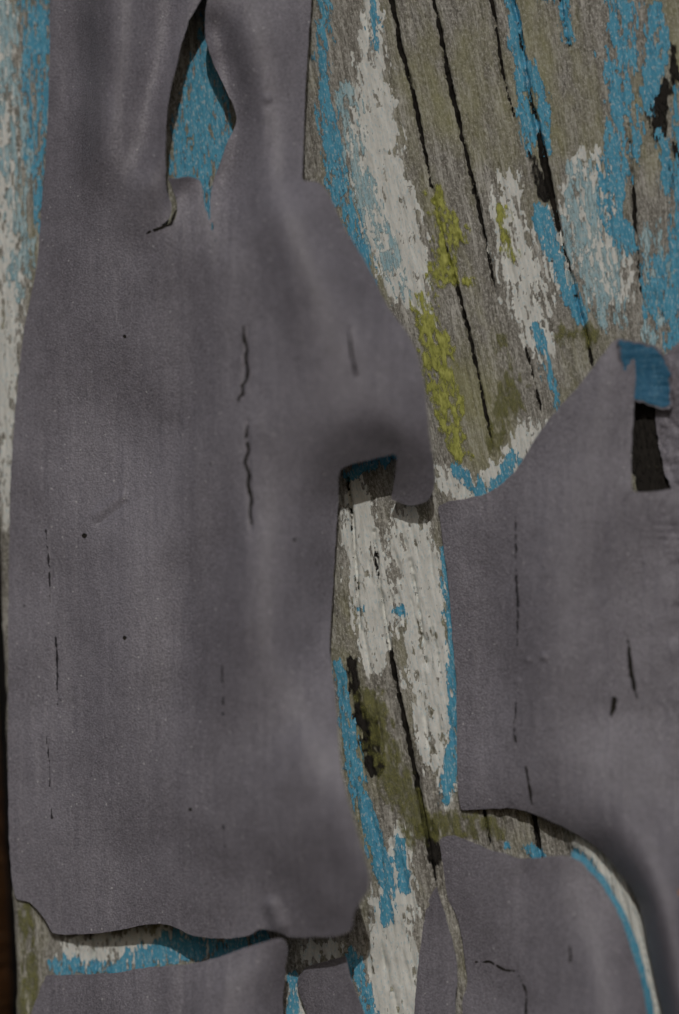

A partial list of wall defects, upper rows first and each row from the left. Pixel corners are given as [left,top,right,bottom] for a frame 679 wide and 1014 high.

peeling [169,26,233,219]
crack [389,0,449,254]
crack [432,0,496,291]
crack [489,0,577,301]
peeling [487,0,646,411]
peeling [637,0,670,117]
peeling [639,126,679,352]
crack [237,325,253,525]
crack [456,281,492,443]
peeling [434,448,517,500]
crack [583,327,594,366]
peeling [31,938,288,1014]